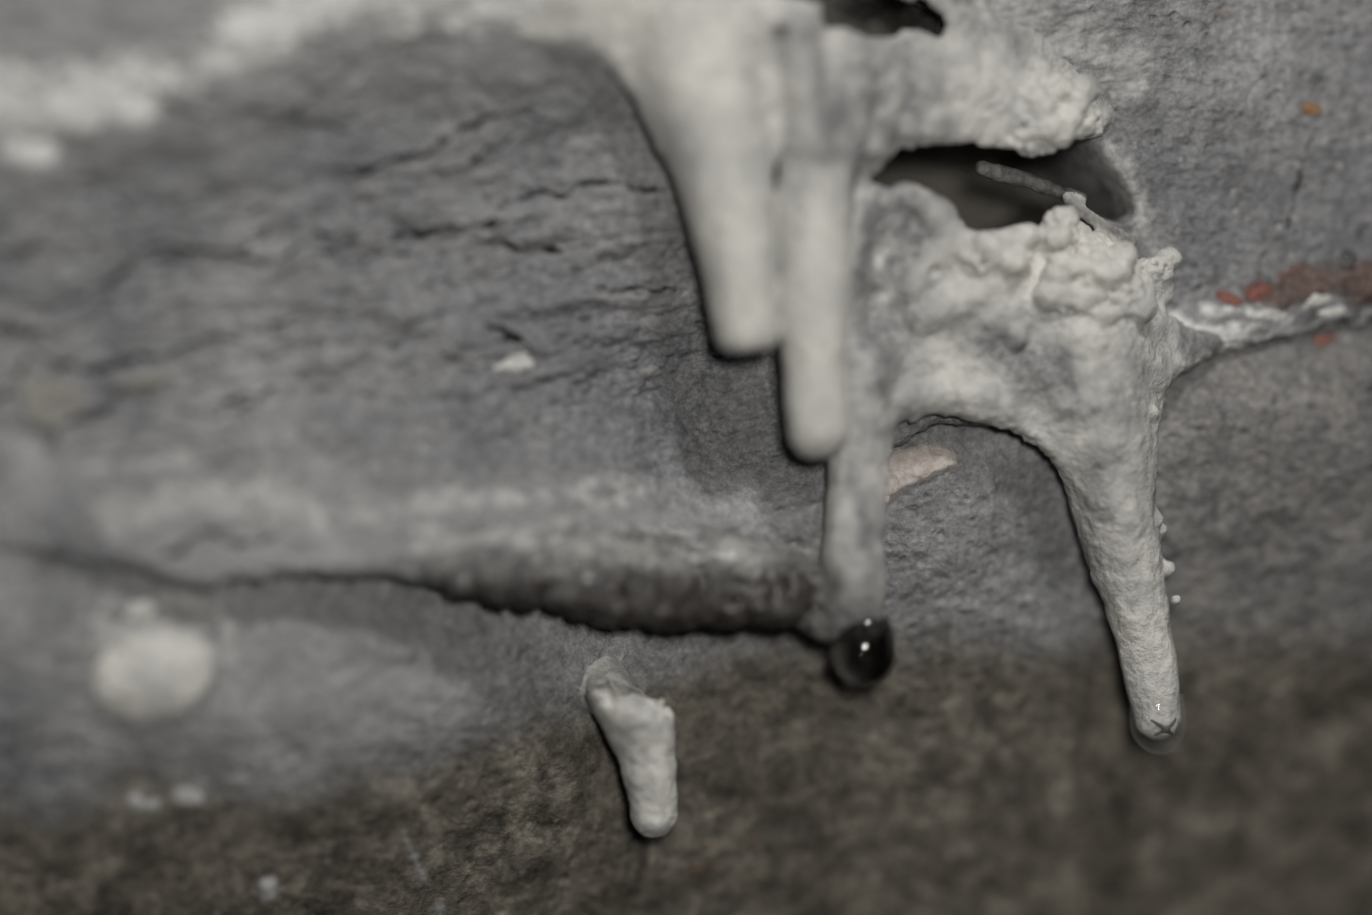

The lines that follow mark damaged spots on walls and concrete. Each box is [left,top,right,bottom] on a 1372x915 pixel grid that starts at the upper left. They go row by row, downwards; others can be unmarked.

crack [338,111,558,177]
crack [72,180,676,299]
leakage [0,0,1292,468]
rust [1217,261,1372,310]
crack [441,323,533,368]
crack [1317,317,1372,329]
leakage [77,586,243,674]